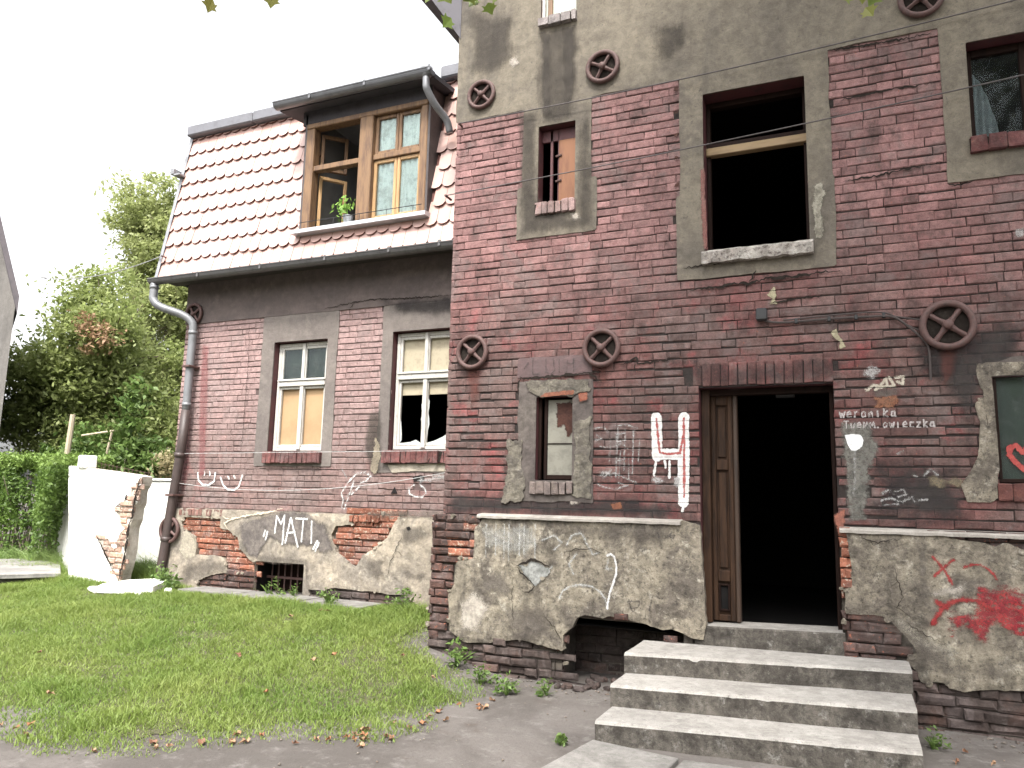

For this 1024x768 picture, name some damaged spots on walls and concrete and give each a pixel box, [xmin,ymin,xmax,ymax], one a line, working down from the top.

water stain [473,15,510,71]
crack [848,162,975,186]
crack [325,295,449,309]
crack [685,262,840,303]
flaking render [526,378,591,401]
flaking render [501,438,526,504]
flaking render [94,478,145,581]
flaking render [181,517,264,591]
flaking render [333,508,408,565]
spalling [425,514,694,692]
crack [891,569,948,645]
flaking render [834,422,1024,742]